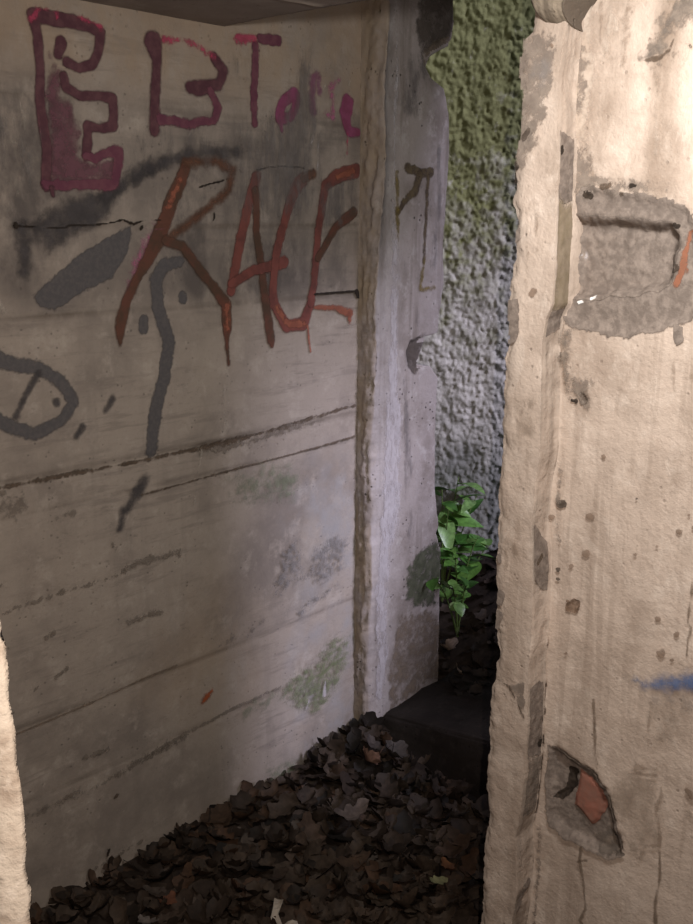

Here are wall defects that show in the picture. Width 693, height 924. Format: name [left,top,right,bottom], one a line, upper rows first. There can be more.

spalling [507,299,519,344]
spalling [514,0,693,407]
spalling [495,590,505,629]
spalling [503,681,625,924]